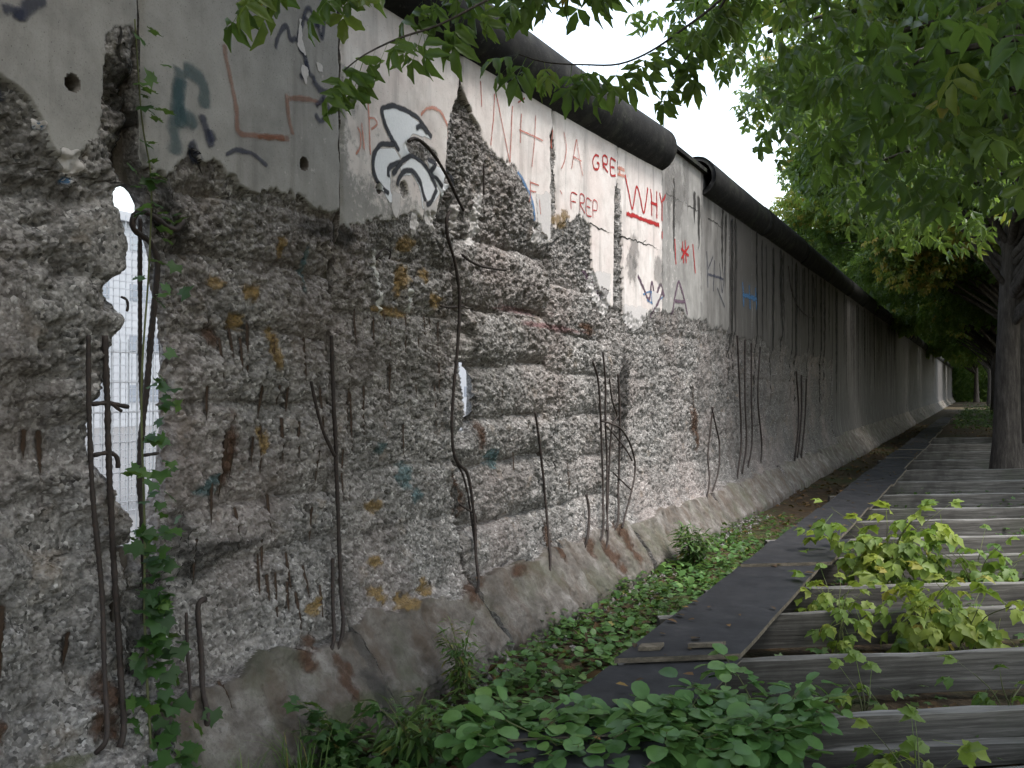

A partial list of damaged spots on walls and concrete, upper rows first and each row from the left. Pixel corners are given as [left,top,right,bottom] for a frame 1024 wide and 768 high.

crack [589,222,659,250]
spalling [0,18,829,768]
corrosion [20,429,42,474]
corrosion [210,413,237,525]
corrosion [583,524,642,573]
corrosion [333,653,360,704]
corrosion [91,673,120,740]